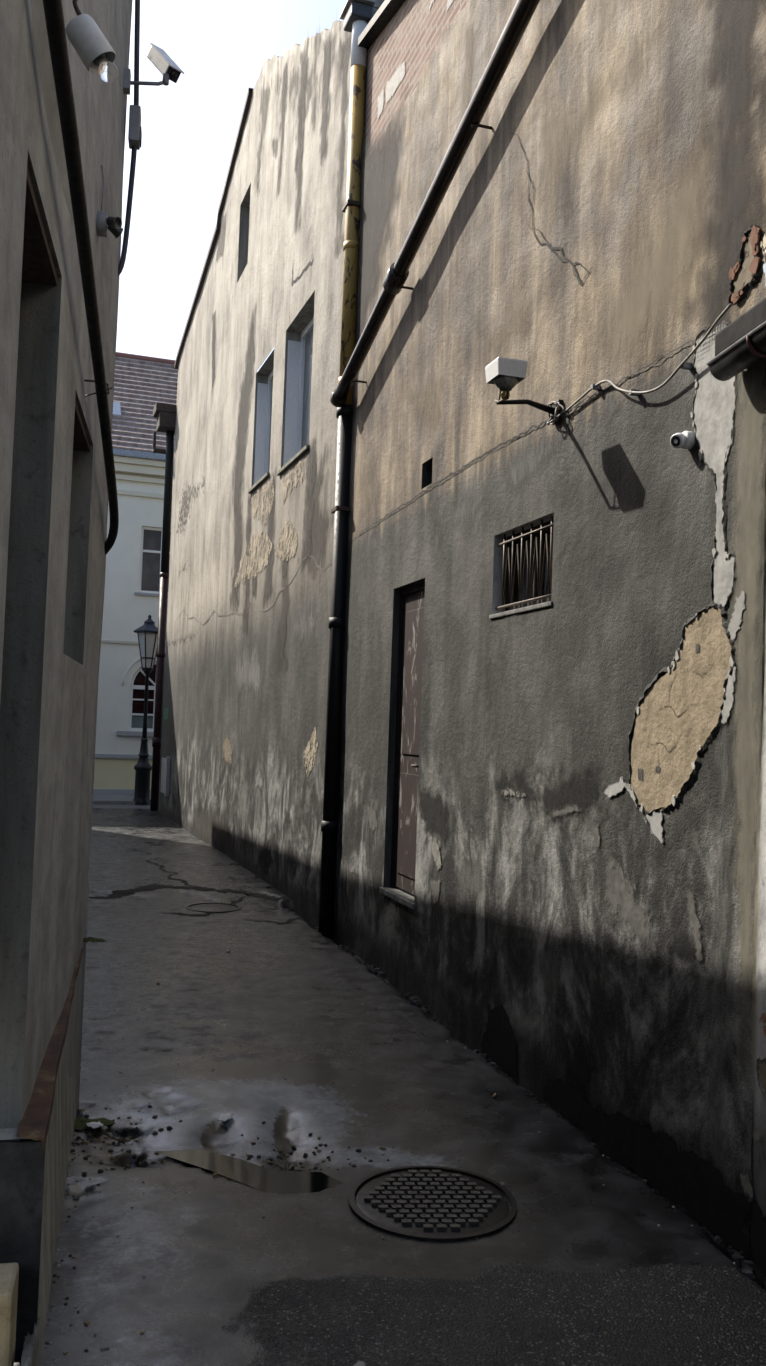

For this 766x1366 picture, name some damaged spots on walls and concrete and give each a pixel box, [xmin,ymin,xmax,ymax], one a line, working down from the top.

water stain [277,40,350,254]
water stain [355,123,400,347]
crack [512,133,590,285]
water stain [604,0,766,358]
water stain [230,306,328,671]
peeling [604,224,766,842]
water stain [235,648,261,693]
water stain [195,784,261,852]
water stain [495,767,606,849]